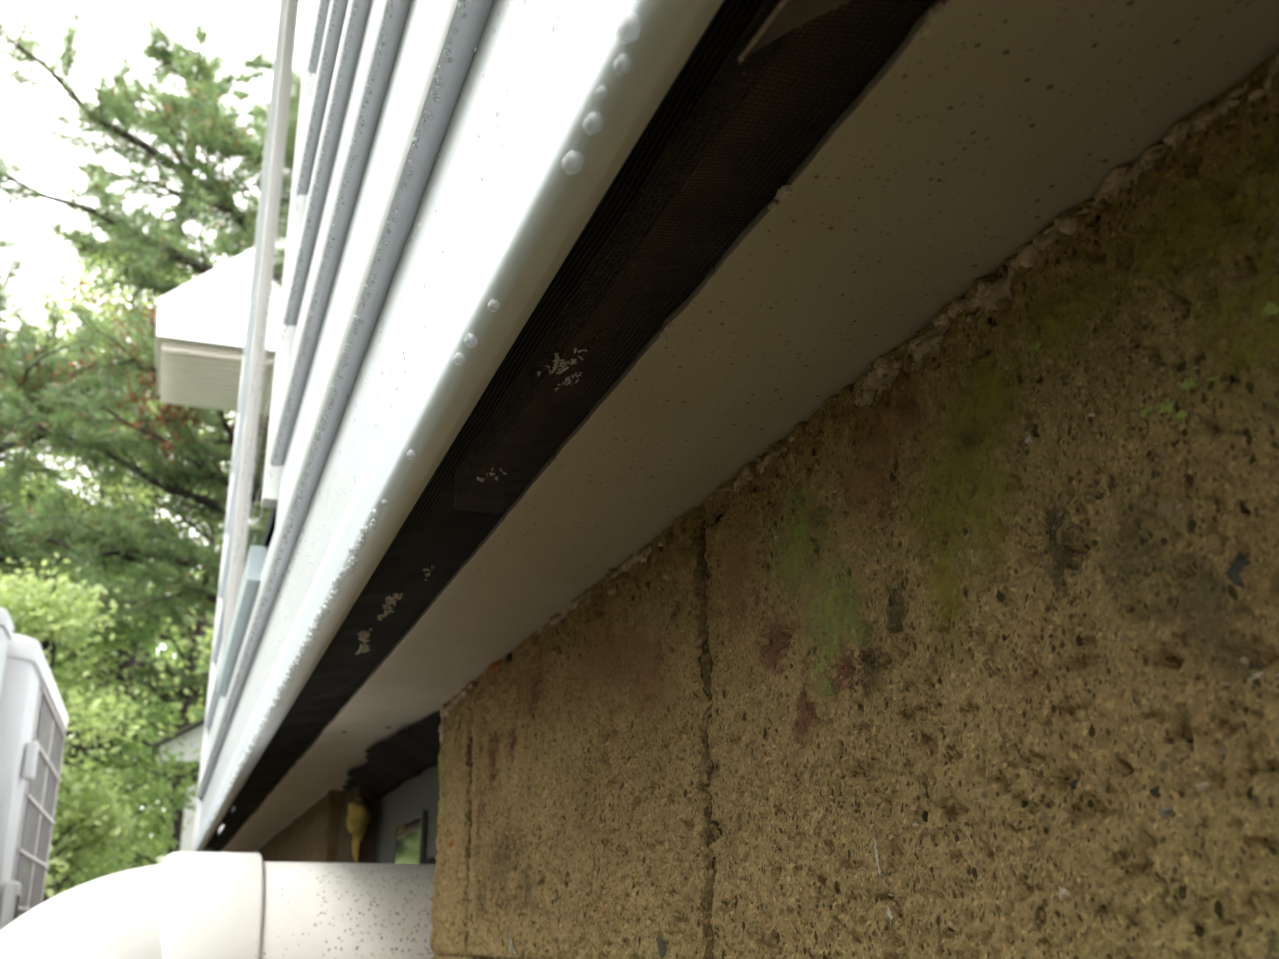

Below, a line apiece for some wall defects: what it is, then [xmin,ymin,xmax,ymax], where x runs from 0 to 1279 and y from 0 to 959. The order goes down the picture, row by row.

crack [452,721,506,959]
crack [692,522,722,959]
leakage [840,568,909,710]
leakage [1032,481,1089,609]